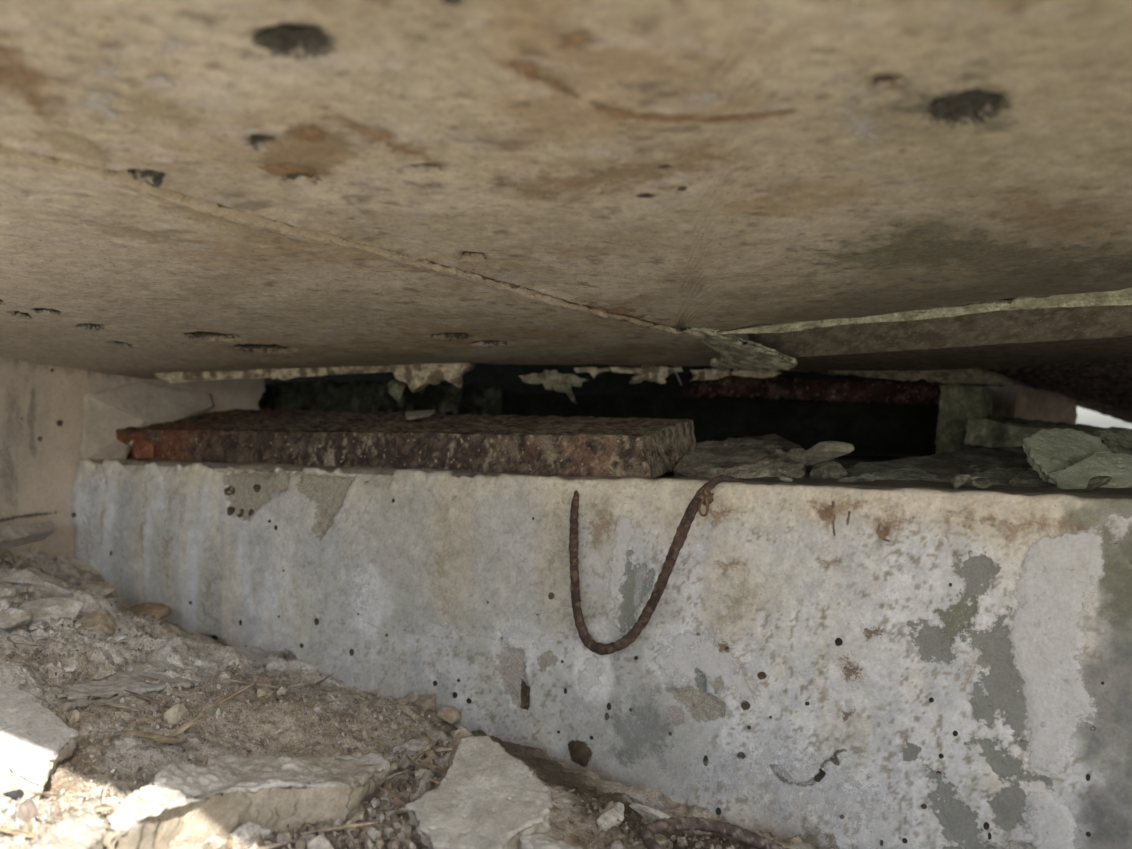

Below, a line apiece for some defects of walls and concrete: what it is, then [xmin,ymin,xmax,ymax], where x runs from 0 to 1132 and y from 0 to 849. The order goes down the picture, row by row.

rust [338,116,437,165]
crack [0,145,705,338]
peeling [552,384,577,404]
spalling [224,469,353,541]
water stain [1007,512,1132,778]
peeling [902,551,1053,849]
water stain [1023,792,1078,849]